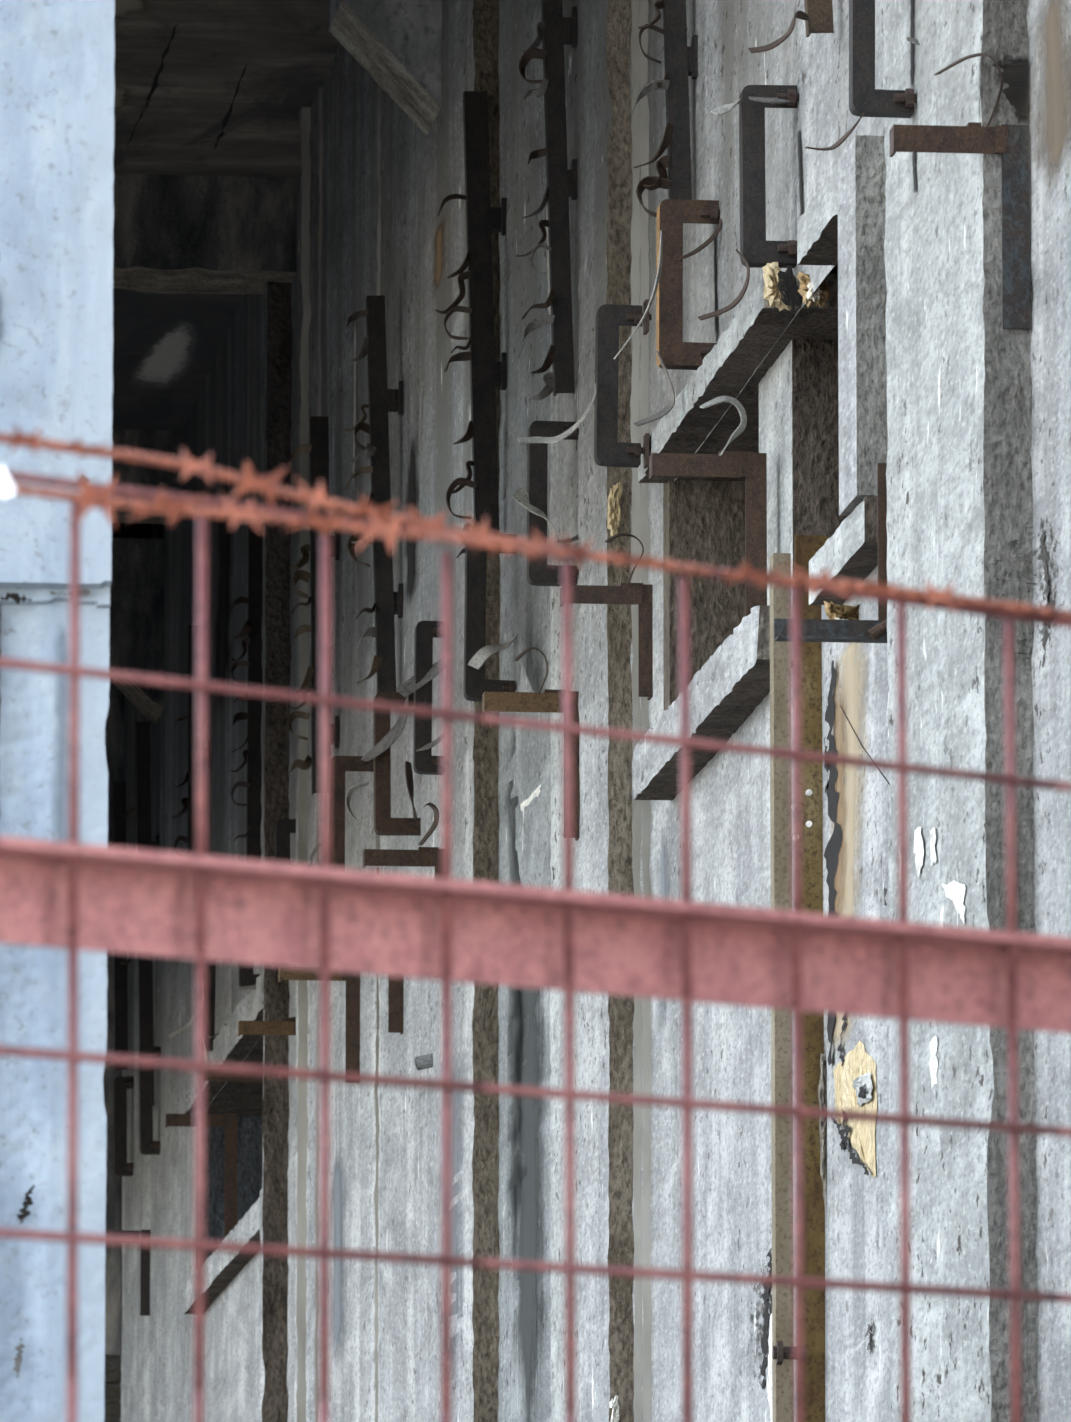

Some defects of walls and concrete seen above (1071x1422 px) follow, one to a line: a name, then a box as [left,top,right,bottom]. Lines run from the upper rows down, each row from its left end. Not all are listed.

crack [0,589,96,657]
peeling [818,1040,877,1204]